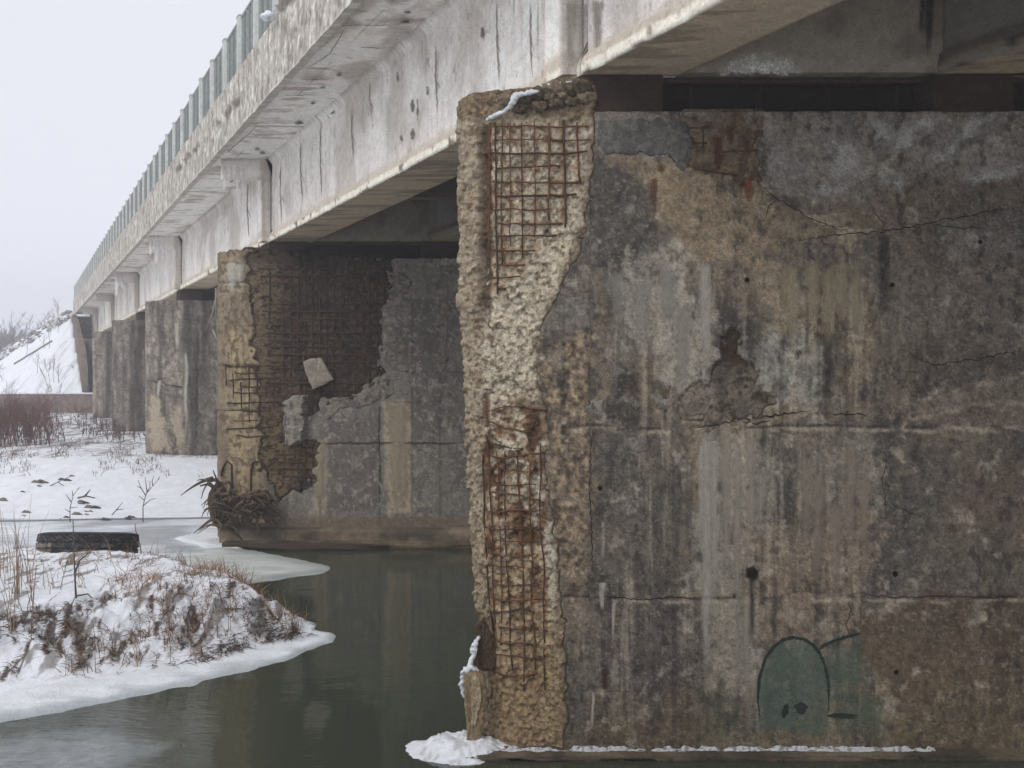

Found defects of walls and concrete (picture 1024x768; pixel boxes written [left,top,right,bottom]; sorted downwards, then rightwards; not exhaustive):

crack [351,84,373,153]
crack [279,123,324,223]
crack [756,140,1021,243]
damp [699,265,711,360]
spalling [223,247,412,500]
spalling [435,85,776,748]
crack [689,409,867,437]
damp [599,583,616,630]
damp [699,436,763,699]